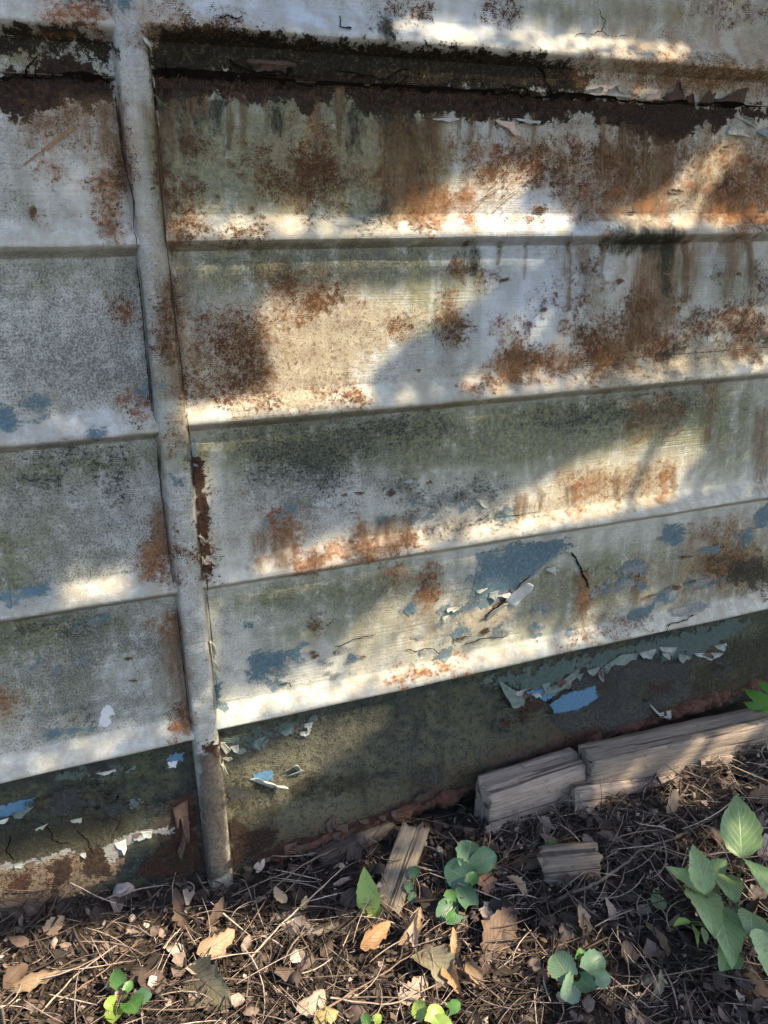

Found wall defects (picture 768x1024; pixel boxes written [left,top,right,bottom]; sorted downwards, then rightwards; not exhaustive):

peeling [140,28,768,228]
corrosion [10,83,768,601]
crack [154,59,768,642]
leakage [579,219,685,296]
corrosion [248,503,444,611]
peeling [480,542,768,735]
peeling [0,797,190,903]
peeling [215,710,493,869]